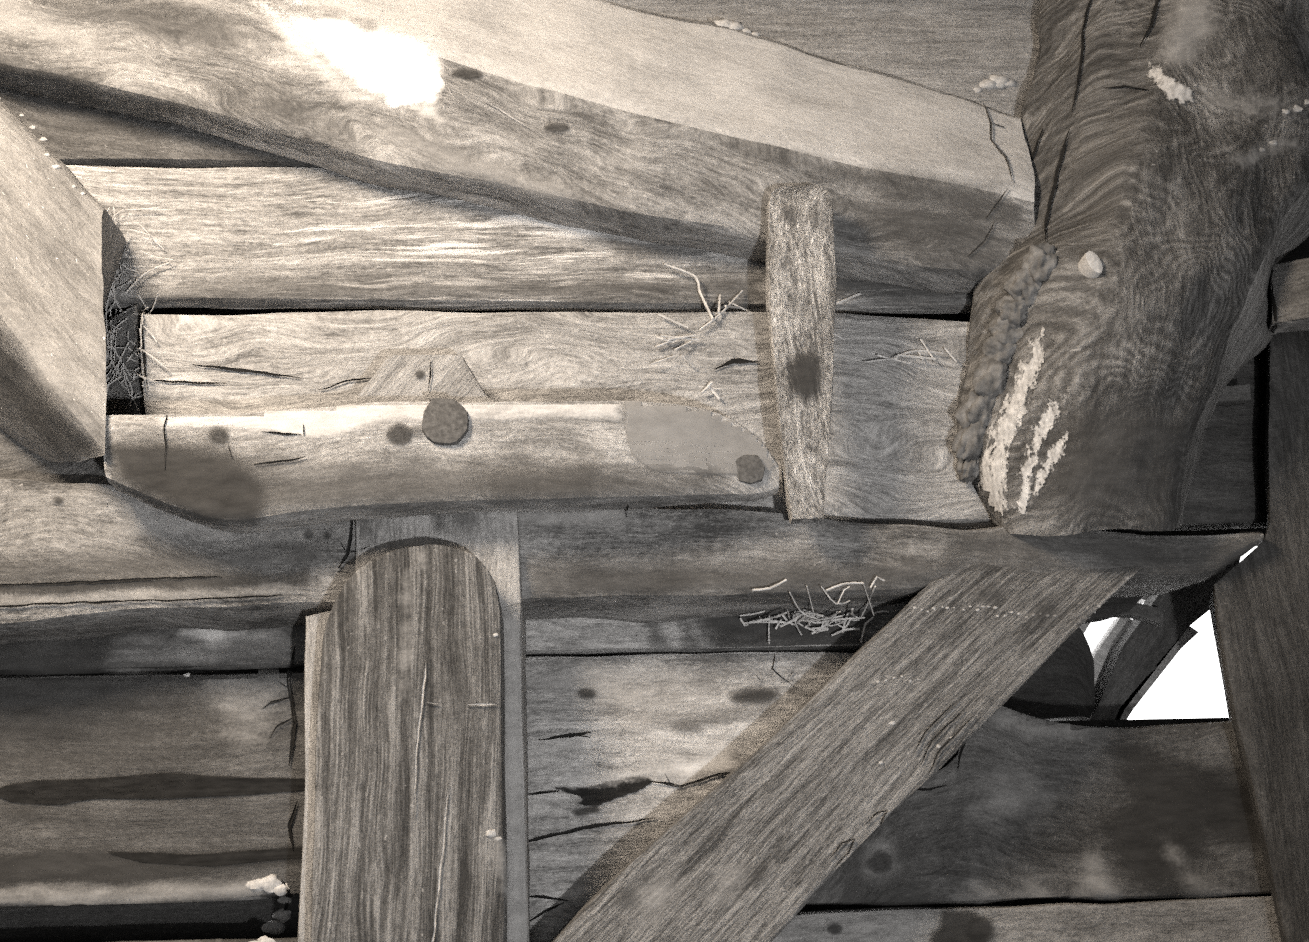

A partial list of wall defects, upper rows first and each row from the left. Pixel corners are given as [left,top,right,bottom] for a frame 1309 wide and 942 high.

crack [1140,0,1159,47]
crack [970,0,1148,255]
leakage [111,443,667,525]
leakage [0,847,302,900]
leakage [931,911,993,942]